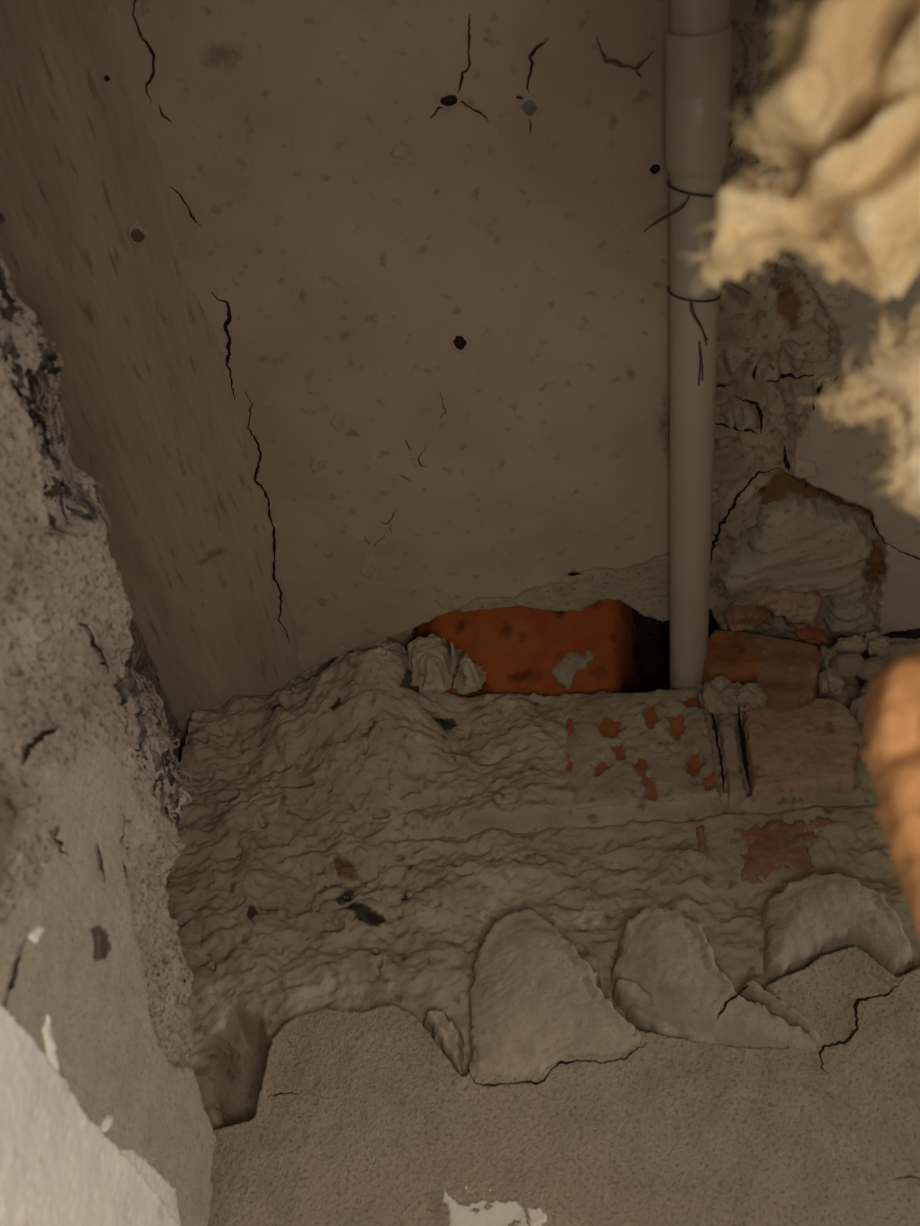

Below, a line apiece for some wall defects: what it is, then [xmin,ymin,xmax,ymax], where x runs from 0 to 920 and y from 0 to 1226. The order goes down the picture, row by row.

crack [132,0,172,123]
crack [431,14,488,121]
crack [516,37,549,134]
crack [211,292,290,642]
crack [710,366,920,566]
spalling [114,630,920,1130]
crack [717,985,748,1020]
crack [819,979,903,1074]
peeling [442,1183,554,1226]